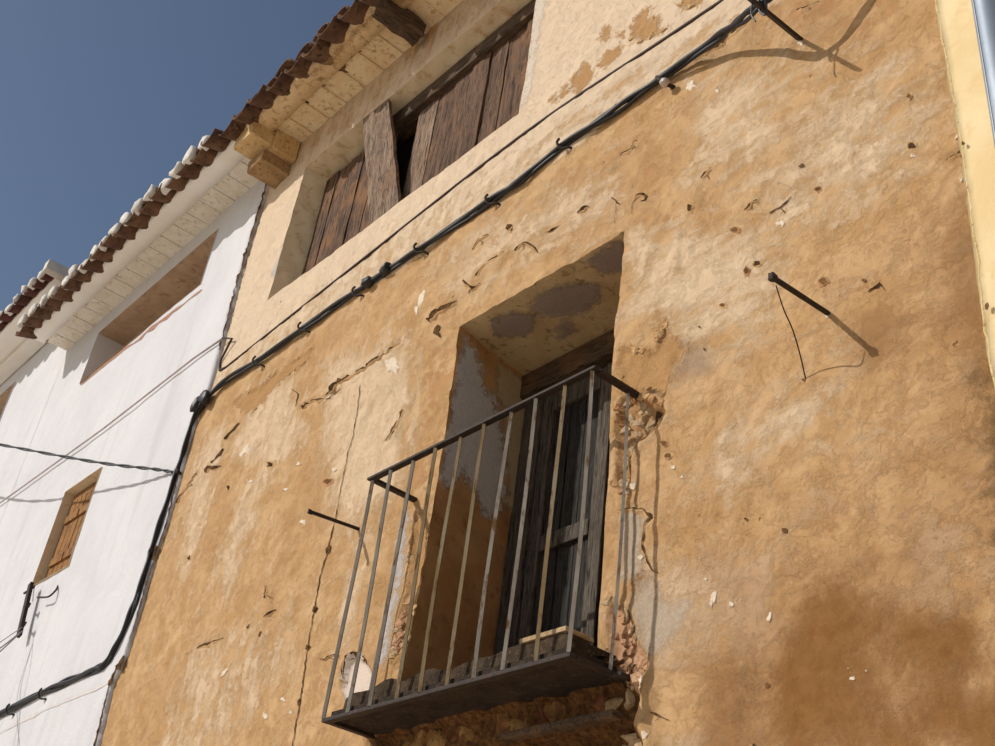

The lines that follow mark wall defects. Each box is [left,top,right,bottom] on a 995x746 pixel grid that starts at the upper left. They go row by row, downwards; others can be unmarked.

spalling [548,5,667,103]
spalling [676,0,704,11]
peeling [439,334,511,521]
crack [291,341,401,746]
spalling [339,506,430,698]
flaking render [373,595,650,746]
crack [619,507,658,573]
damp [776,588,995,746]